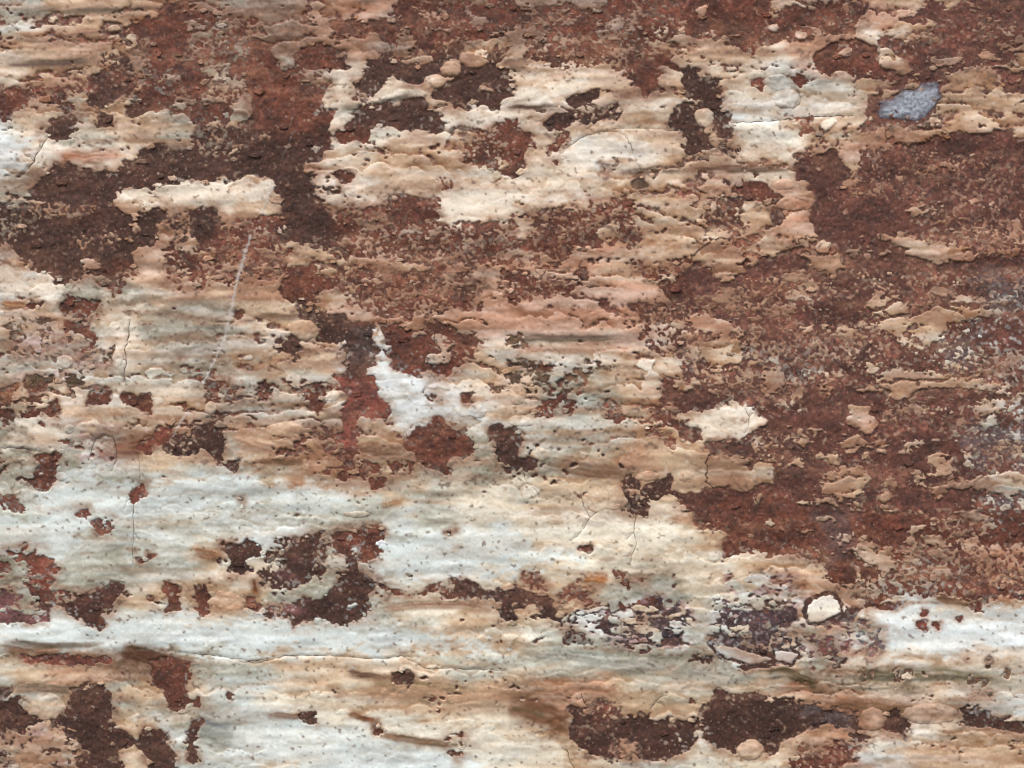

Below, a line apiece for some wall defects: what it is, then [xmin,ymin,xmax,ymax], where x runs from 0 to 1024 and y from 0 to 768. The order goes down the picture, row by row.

rust [94,112,114,129]
rust [630,172,655,195]
rust [461,392,476,404]
rust [387,416,479,478]
rust [147,581,212,618]
rust [196,524,690,654]
rust [804,634,853,669]
rust [0,645,210,768]
rust [510,688,913,768]